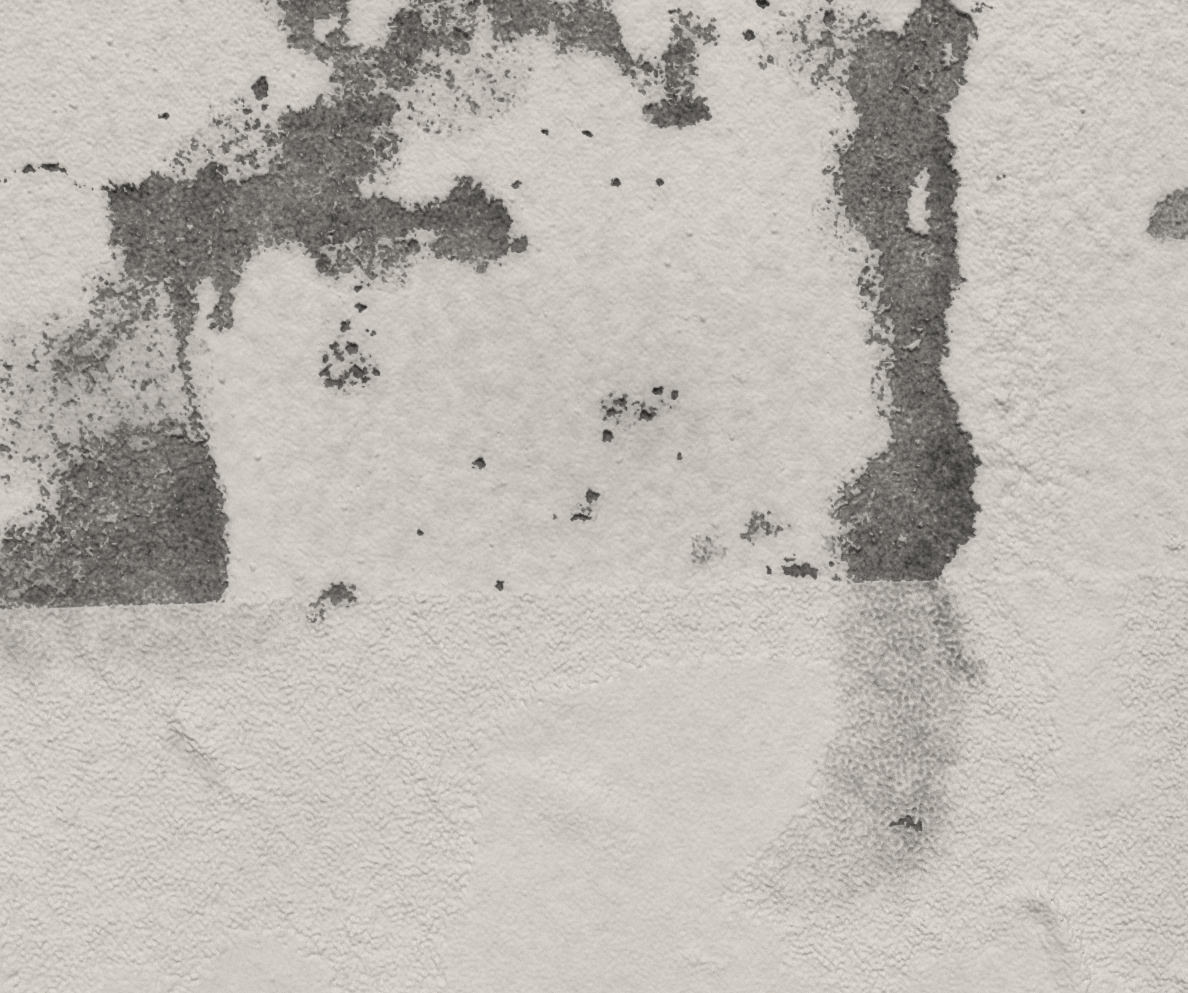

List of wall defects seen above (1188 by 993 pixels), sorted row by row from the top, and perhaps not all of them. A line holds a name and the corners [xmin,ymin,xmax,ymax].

peeling [758,55,774,70]
crack [0,162,149,205]
spalling [1146,188,1188,240]
peeling [0,0,725,610]
peeling [776,0,993,583]